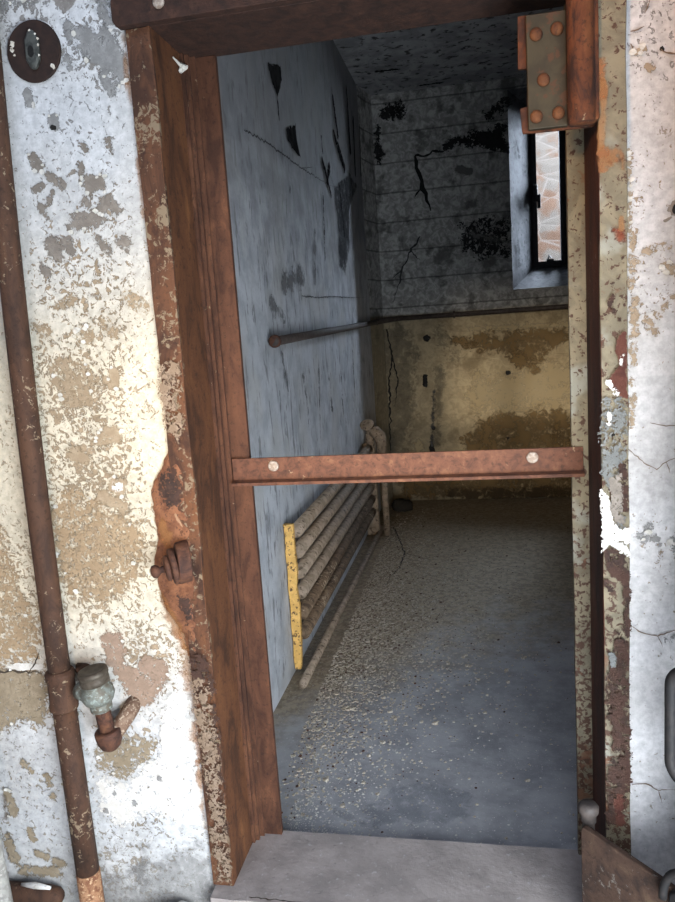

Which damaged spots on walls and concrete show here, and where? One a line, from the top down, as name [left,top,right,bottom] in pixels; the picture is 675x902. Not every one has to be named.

peeling [22,87,35,108]
spalling [47,113,60,132]
peeling [27,151,67,220]
peeling [37,140,133,283]
crack [414,149,448,211]
peeling [30,317,53,341]
peeling [53,292,78,311]
peeling [73,316,120,347]
peeling [122,288,150,314]
crack [386,329,399,452]
peeling [597,146,675,830]
peeling [0,526,47,731]